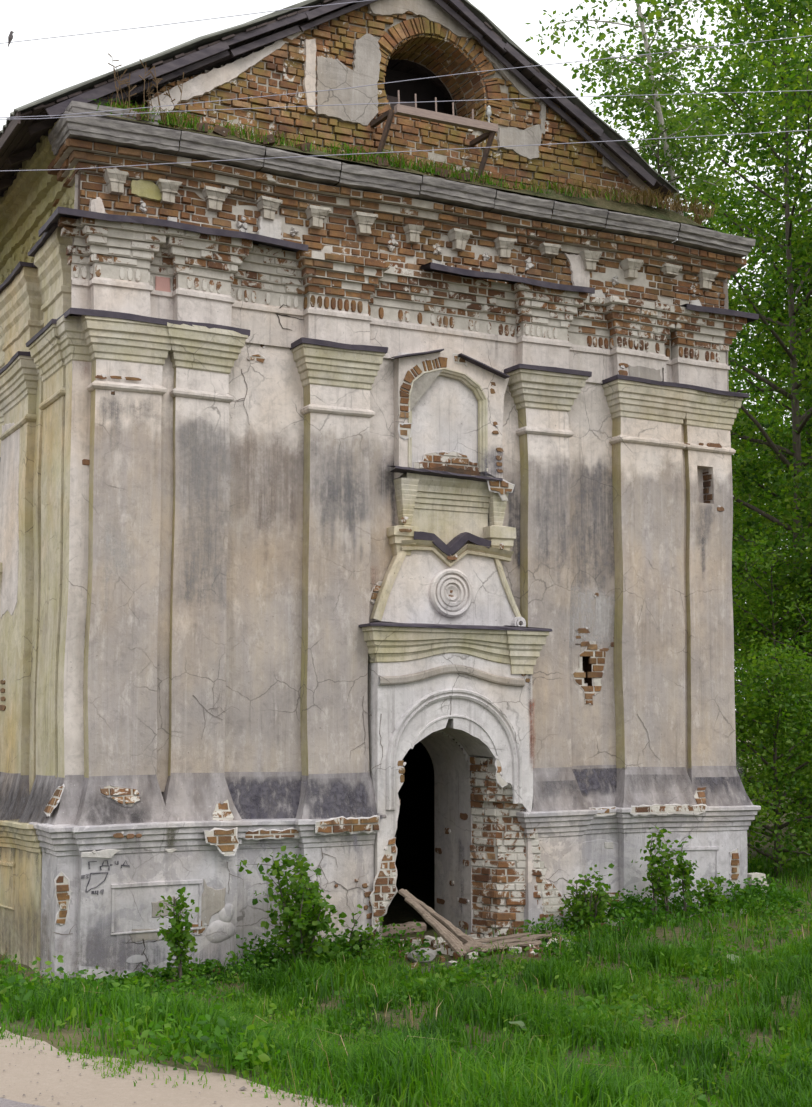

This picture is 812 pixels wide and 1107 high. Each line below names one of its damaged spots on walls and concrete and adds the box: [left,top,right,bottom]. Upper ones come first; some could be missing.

flaking render [146,30,381,126]
flaking render [368,0,546,161]
flaking render [257,216,283,250]
spalling [398,353,468,440]
spalling [571,627,614,705]
crack [192,688,239,735]
spalling [99,783,141,807]
damp [228,777,381,819]
spalling [495,757,508,788]
spalling [204,799,301,856]
spalling [54,871,72,925]
spalling [315,815,398,932]